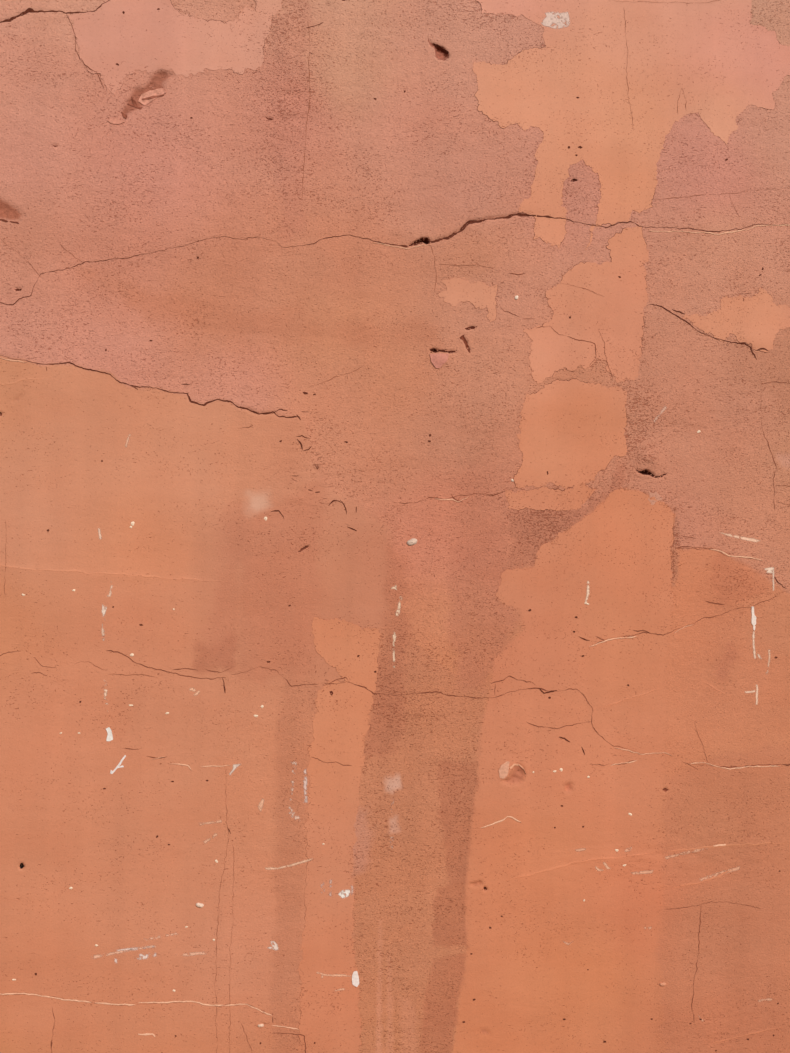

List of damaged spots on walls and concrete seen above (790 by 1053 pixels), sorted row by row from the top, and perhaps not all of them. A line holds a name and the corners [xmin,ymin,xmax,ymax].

crack [0,0,109,84]
peeling [68,0,282,124]
spalling [428,39,449,61]
crack [0,188,790,305]
spalling [430,326,477,368]
peeling [473,0,790,697]
crack [651,304,768,358]
water stain [362,540,416,796]
crack [0,650,790,770]
peeling [263,617,488,1053]
crack [1,748,306,1053]
water stain [373,757,483,1053]